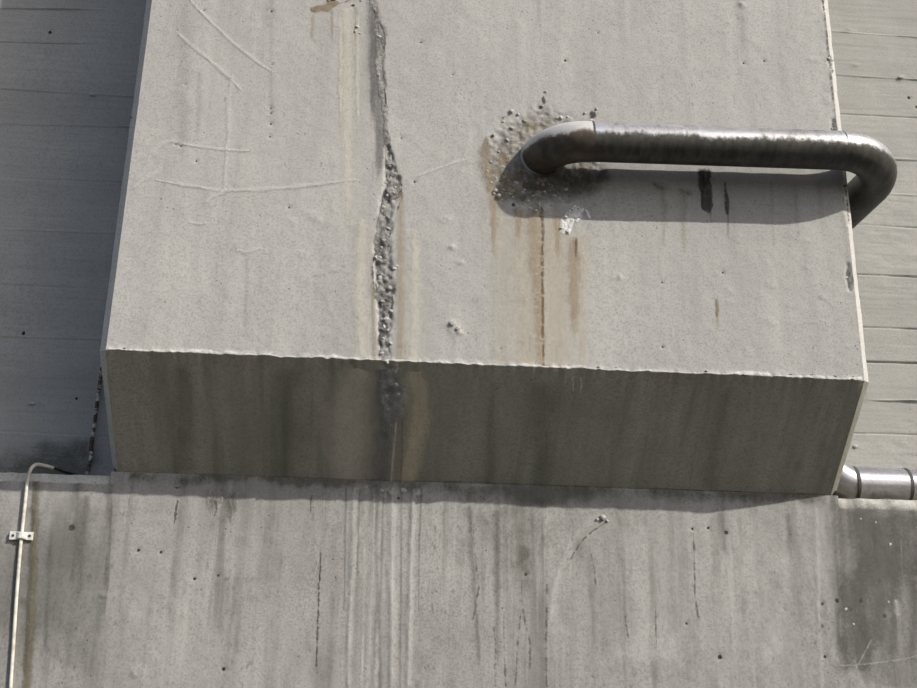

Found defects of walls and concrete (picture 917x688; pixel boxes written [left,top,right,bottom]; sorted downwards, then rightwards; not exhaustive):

crack [345,0,403,364]
spalling [481,90,608,212]
leakage [699,168,713,212]
corrosion [532,207,545,367]
leakage [11,442,88,688]